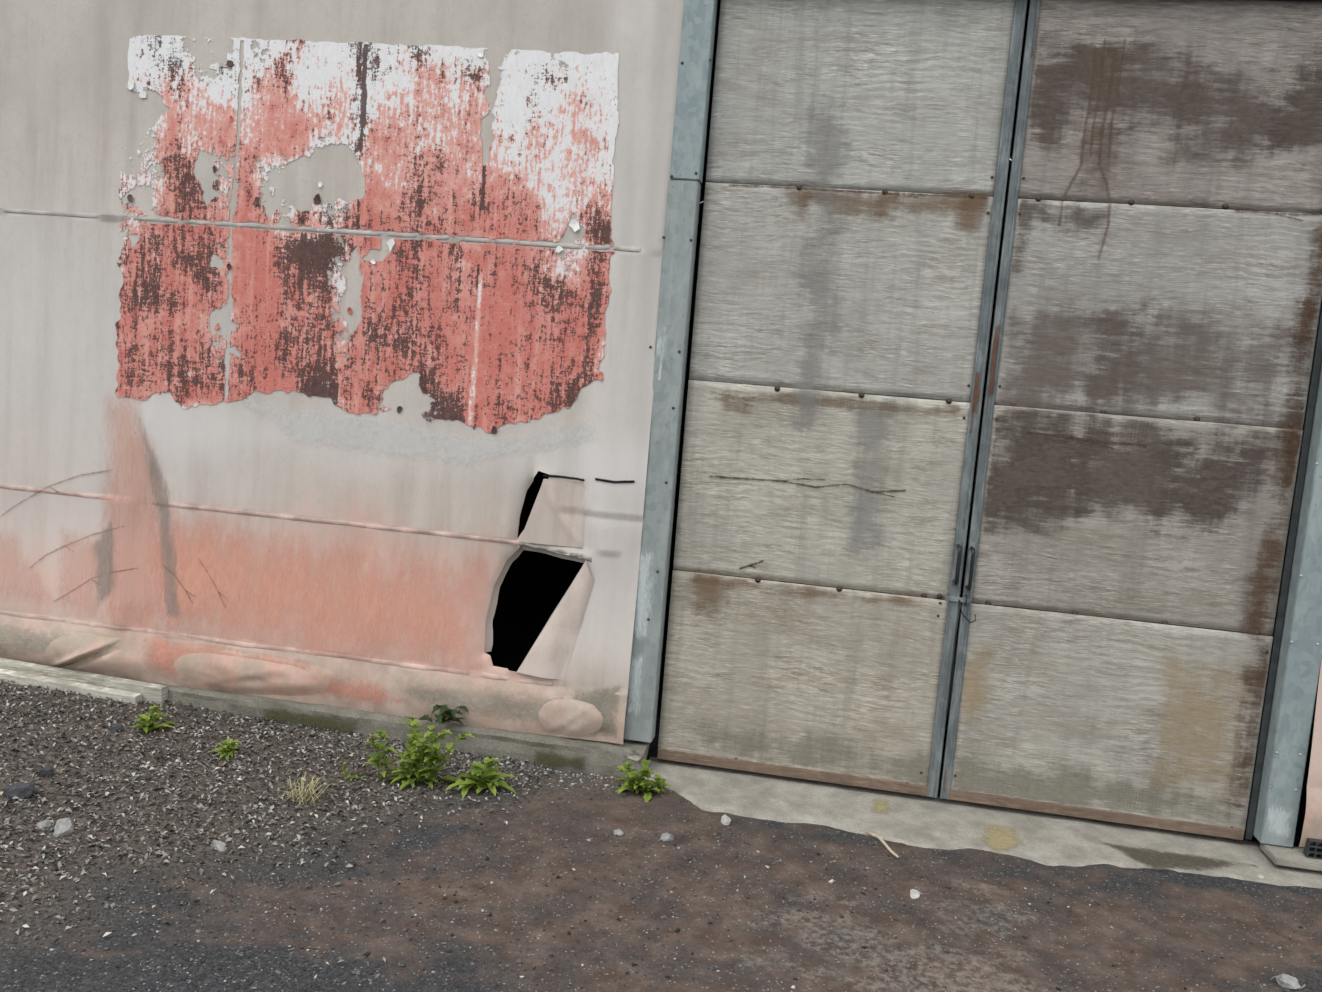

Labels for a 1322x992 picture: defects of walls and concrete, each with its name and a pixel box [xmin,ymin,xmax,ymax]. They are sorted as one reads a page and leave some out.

water stain [1030,41,1322,179]
peeling [115,35,619,434]
crack [709,476,906,497]
water stain [985,312,1300,534]